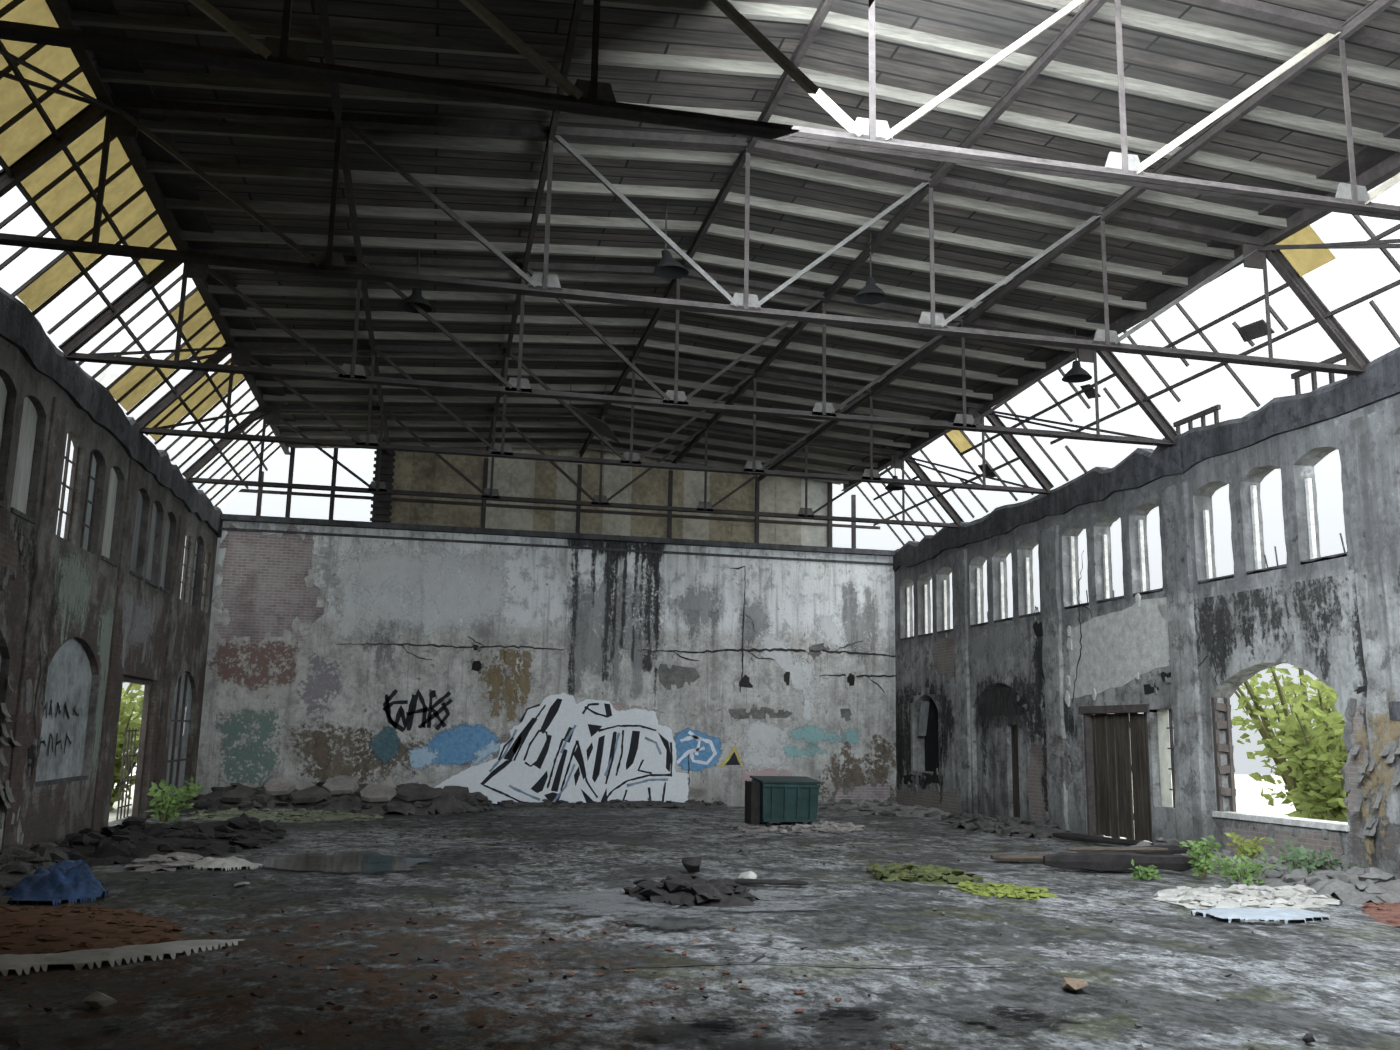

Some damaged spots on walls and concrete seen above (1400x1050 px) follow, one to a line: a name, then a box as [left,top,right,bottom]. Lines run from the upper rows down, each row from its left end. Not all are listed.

peeling [0,676,37,850]
damp [566,539,722,711]
damp [737,602,827,720]
damp [1026,637,1049,812]
damp [1194,576,1368,746]